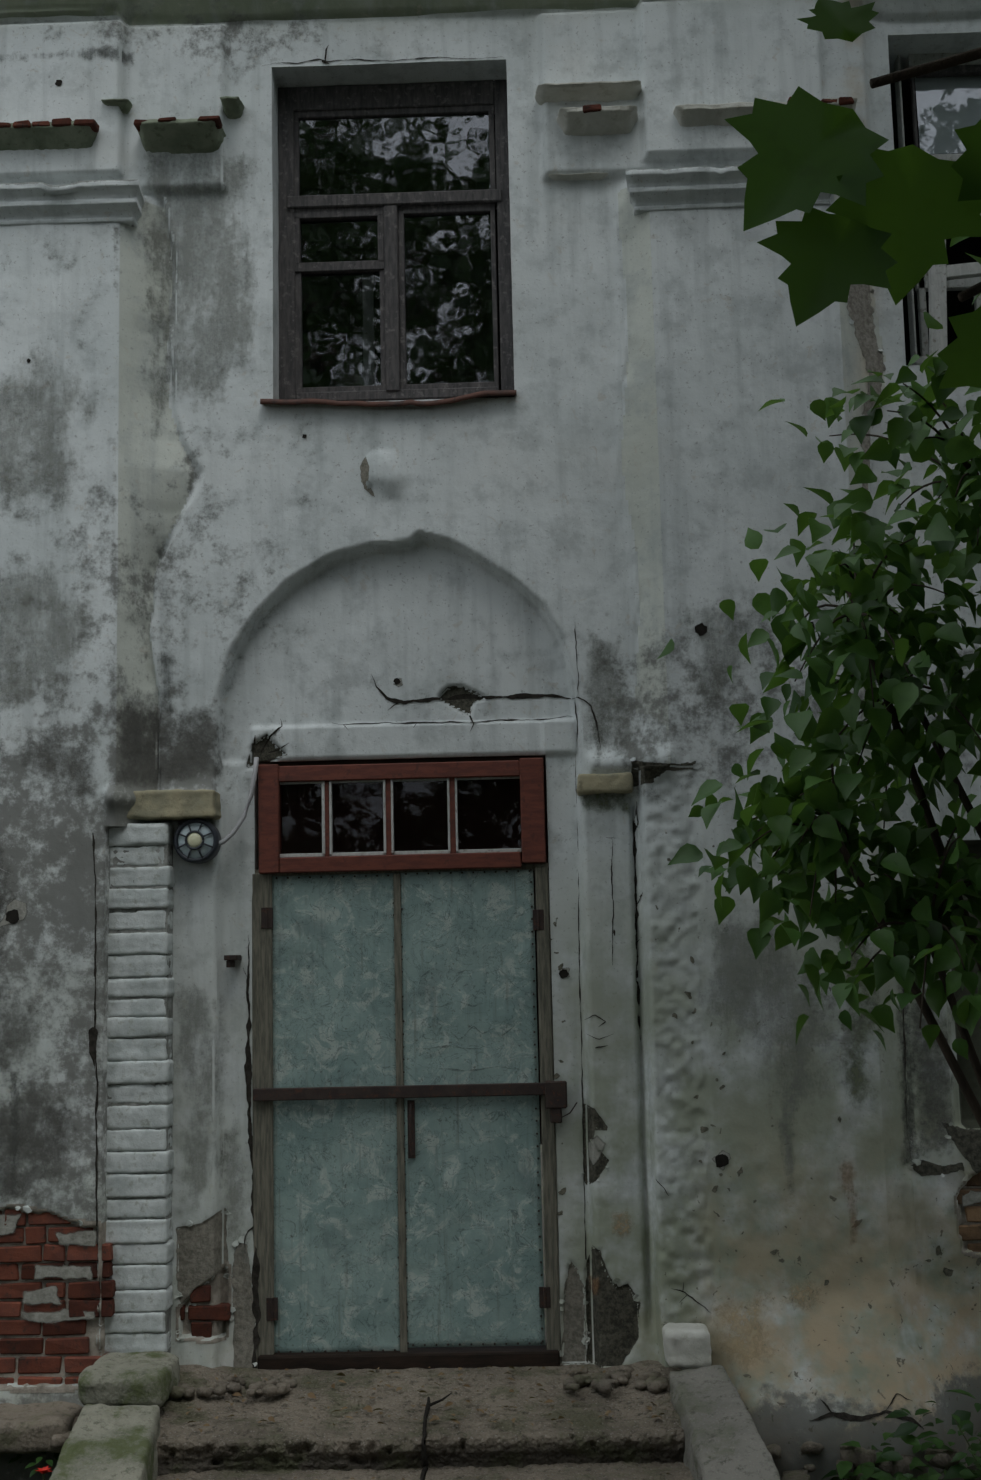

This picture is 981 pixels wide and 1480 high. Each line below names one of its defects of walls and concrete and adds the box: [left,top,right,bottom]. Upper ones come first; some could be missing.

spalling [847,284,886,490]
damp [27,738,90,795]
crack [334,629,643,1260]
damp [0,987,68,1196]
flaking render [908,1122,981,1266]
flaking render [0,1204,116,1393]
spalling [174,1208,258,1368]
spalling [559,1246,641,1368]
crack [420,1392,452,1480]